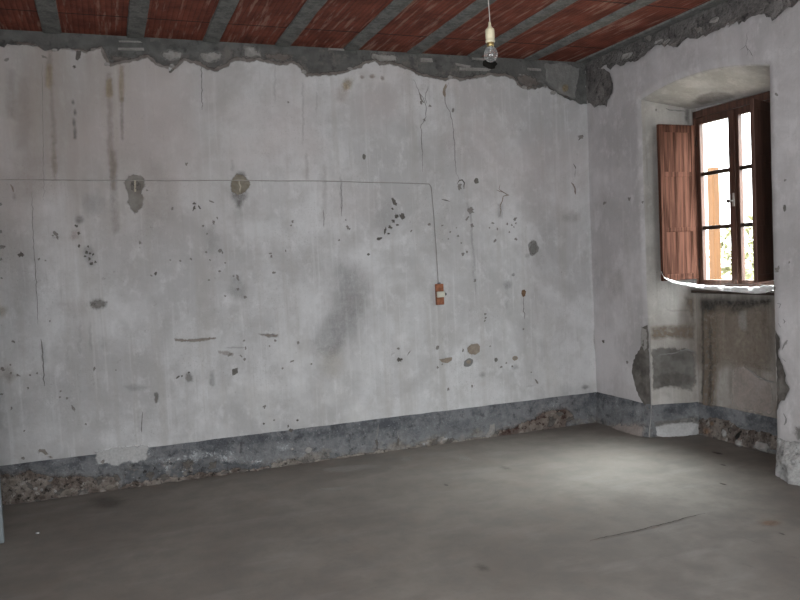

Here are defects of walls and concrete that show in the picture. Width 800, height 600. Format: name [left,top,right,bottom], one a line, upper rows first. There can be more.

flaking render [0,0,799,108]
crack [416,83,460,180]
spalling [462,343,480,367]
spalling [626,325,651,409]
spalling [775,331,789,408]
spalling [498,408,573,436]
spalling [655,417,777,452]
spalling [0,446,332,506]